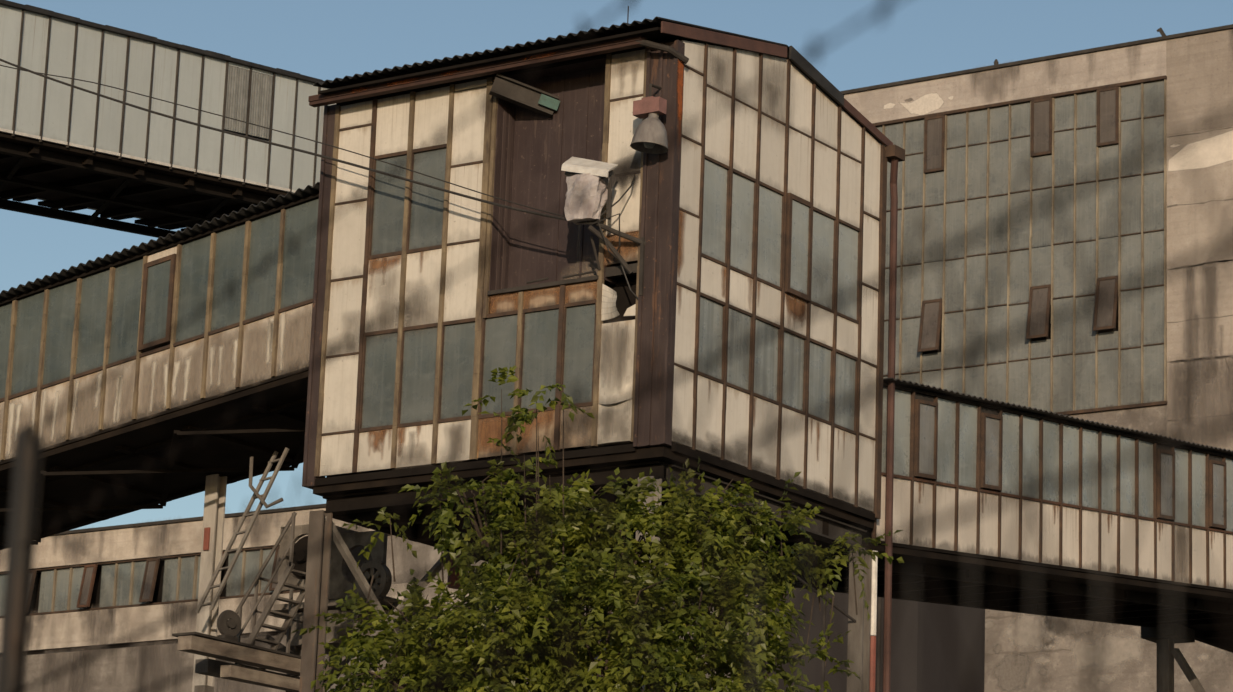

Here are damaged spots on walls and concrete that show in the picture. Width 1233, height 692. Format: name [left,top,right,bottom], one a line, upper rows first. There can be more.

peeling [883,93,954,115]
peeling [1168,130,1233,172]
damp [0,312,312,454]
rust [369,426,420,453]
rust [479,412,553,449]